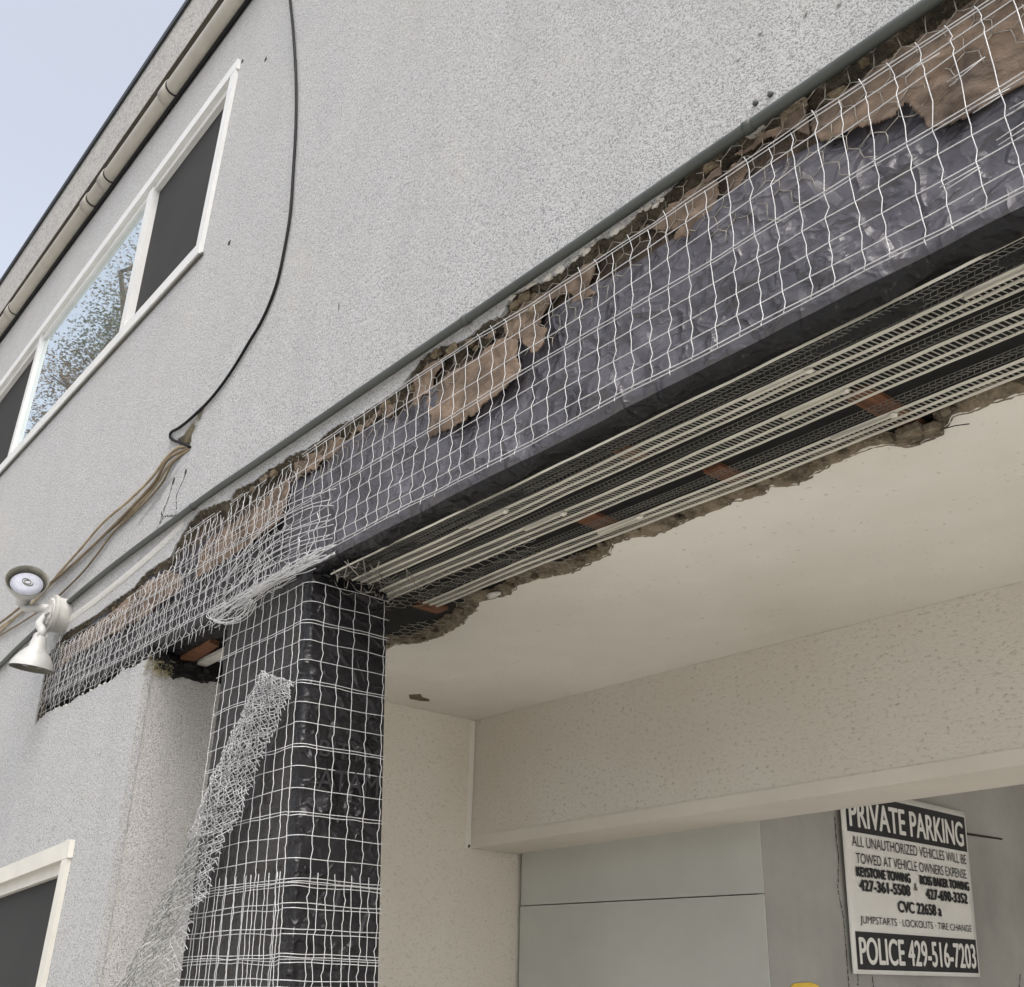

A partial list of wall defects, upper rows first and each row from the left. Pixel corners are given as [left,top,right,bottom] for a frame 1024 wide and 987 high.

flaking render [804,0,974,114]
flaking render [36,112,782,723]
flaking render [386,374,1024,650]